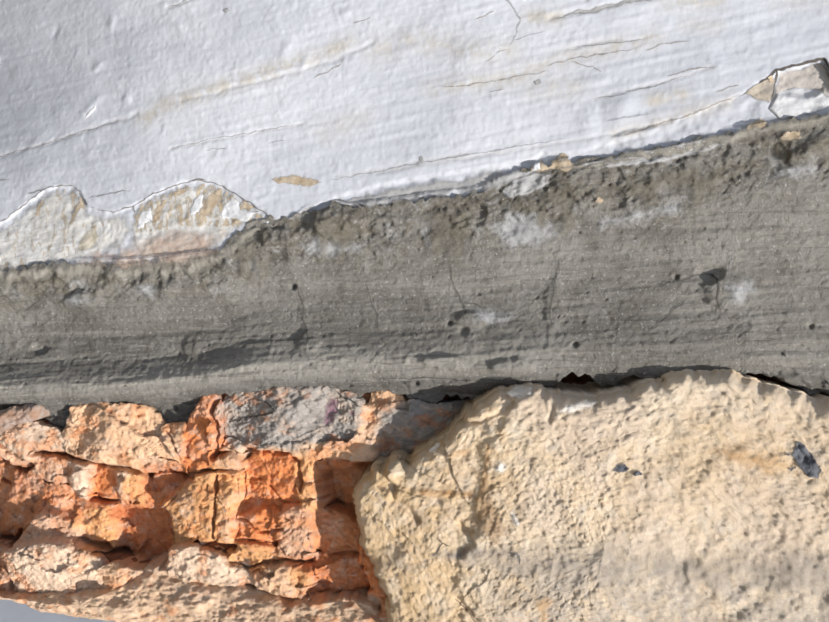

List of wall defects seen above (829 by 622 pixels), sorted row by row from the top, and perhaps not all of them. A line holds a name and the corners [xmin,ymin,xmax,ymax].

crack [477,0,541,61]
crack [172,125,293,151]
crack [444,39,686,92]
crack [599,57,829,137]
spalling [747,119,767,130]
spalling [746,64,829,120]
peeling [0,184,263,272]